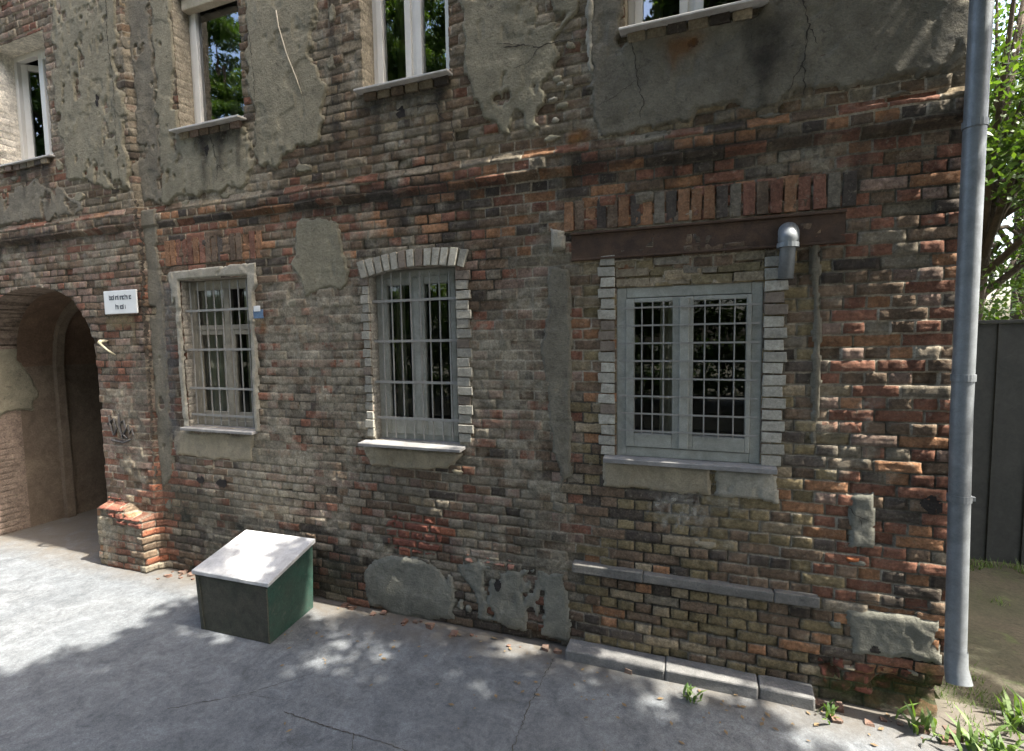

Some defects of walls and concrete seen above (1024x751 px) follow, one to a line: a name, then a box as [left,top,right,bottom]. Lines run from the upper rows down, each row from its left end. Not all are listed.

flaking render [460,0,969,143]
crack [788,0,818,95]
flaking render [0,0,337,488]
flaking render [288,217,350,307]
spalling [98,496,142,529]
flaking render [364,515,572,641]
flaking render [817,608,942,695]